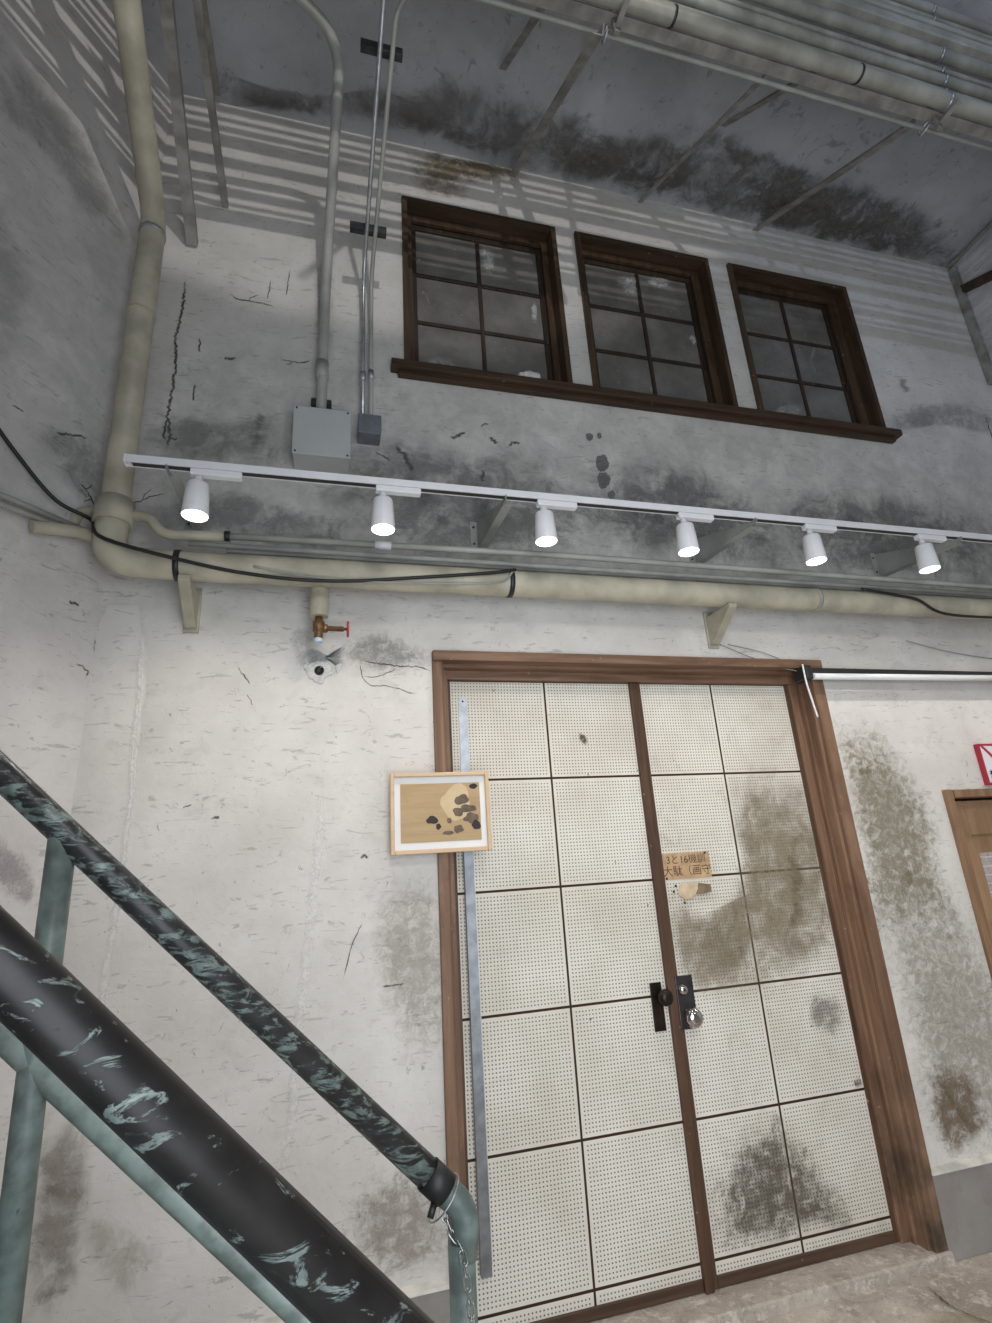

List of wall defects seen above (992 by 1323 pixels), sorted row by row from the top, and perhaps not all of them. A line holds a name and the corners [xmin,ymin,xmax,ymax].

leakage [381,91,519,180]
leakage [538,120,943,259]
crack [162,284,201,444]
leakage [847,741,945,918]
leakage [933,1074,983,1148]
crack [933,1291,991,1323]